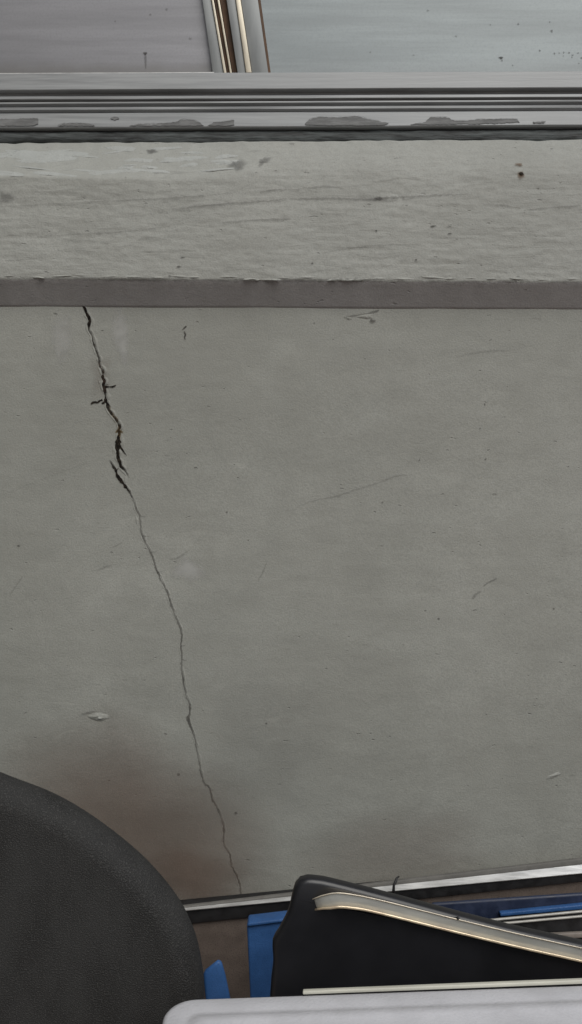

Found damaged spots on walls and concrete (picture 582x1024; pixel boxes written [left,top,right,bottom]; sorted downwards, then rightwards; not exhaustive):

crack [82,306,243,894]